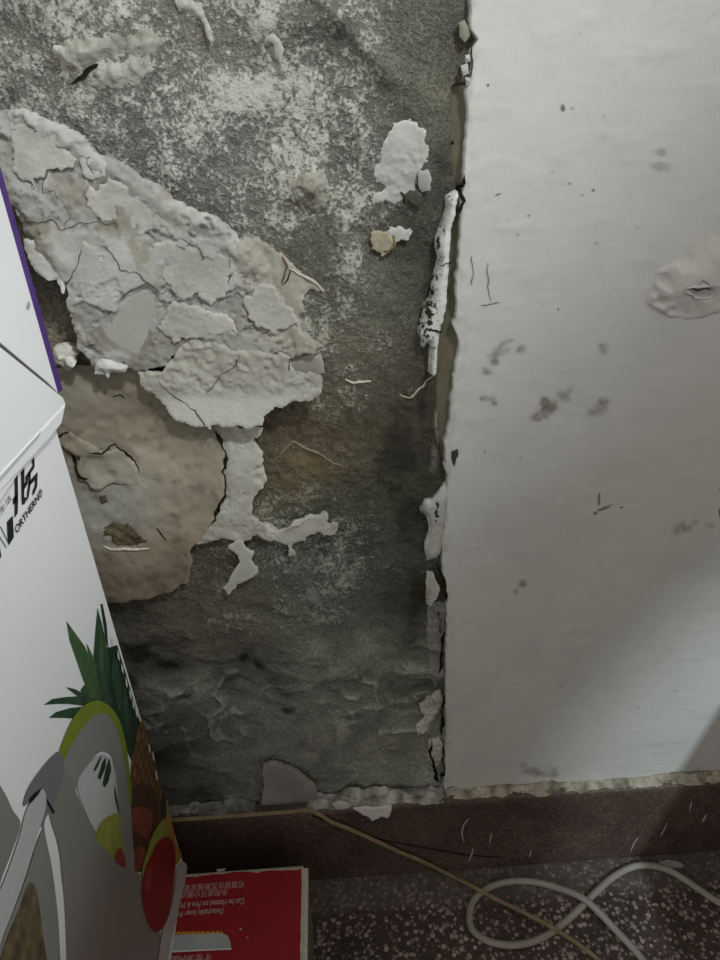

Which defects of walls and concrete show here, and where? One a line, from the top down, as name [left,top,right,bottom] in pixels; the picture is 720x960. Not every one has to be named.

flaking render [175,0,213,47]
flaking render [52,27,166,92]
peeling [266,33,287,71]
peeling [418,169,432,192]
peeling [370,226,413,256]
crack [428,20,500,461]
flaking render [0,108,338,595]
spalling [416,480,453,791]
peeling [332,800,392,821]